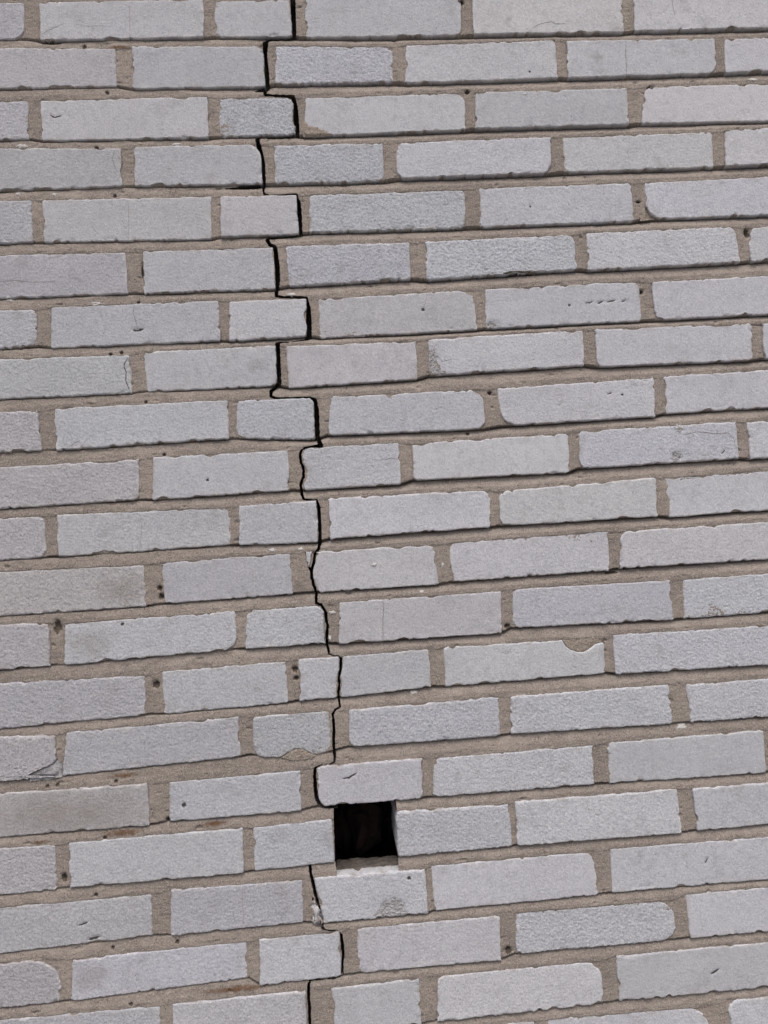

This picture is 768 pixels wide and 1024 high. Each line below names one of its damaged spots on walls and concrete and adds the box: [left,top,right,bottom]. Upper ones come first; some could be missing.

crack [225,0,342,809]
spalling [333,800,399,871]
crack [307,864,345,1024]